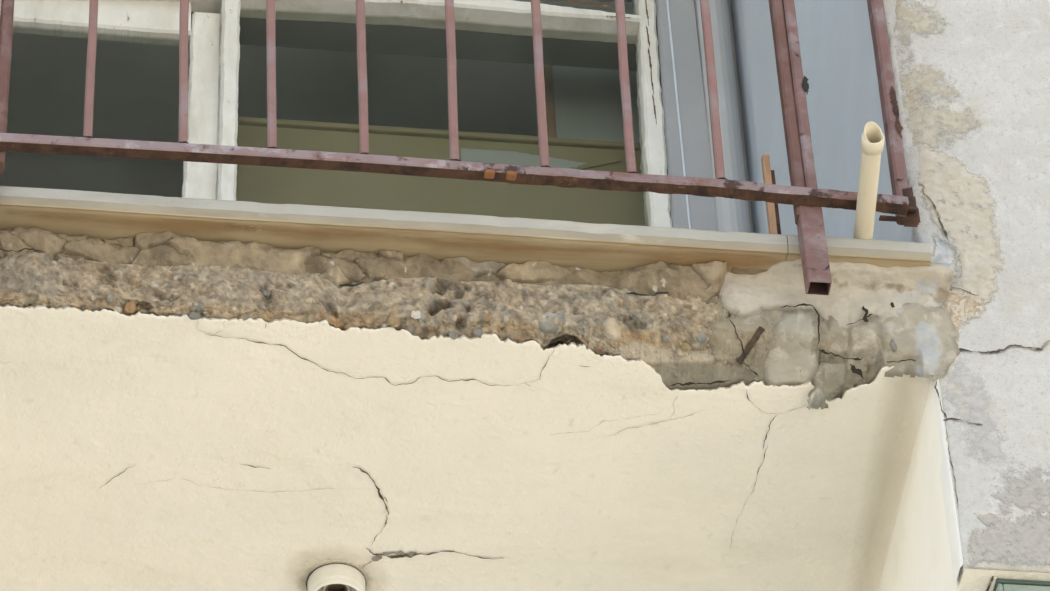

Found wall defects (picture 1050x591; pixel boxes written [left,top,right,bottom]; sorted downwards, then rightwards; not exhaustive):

spalling [0,0,1004,410]
crack [197,321,554,387]
crack [959,340,1050,353]
crack [312,467,504,569]
crack [730,390,806,551]